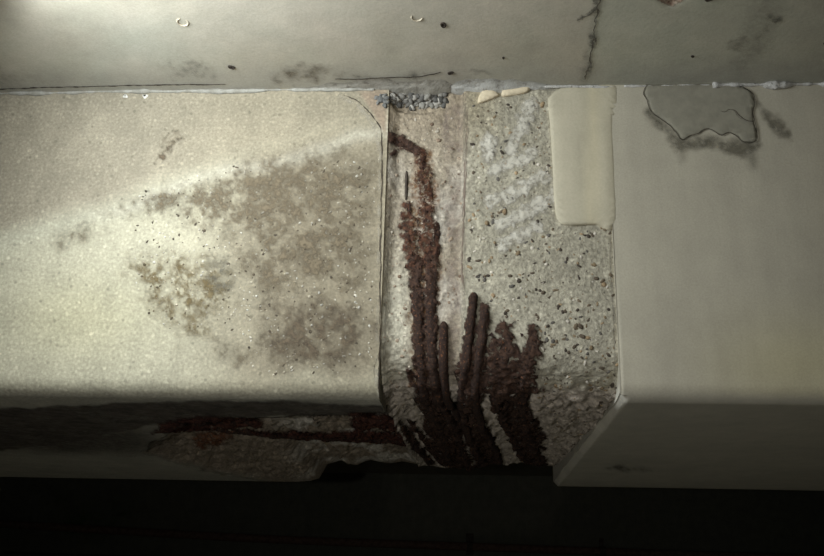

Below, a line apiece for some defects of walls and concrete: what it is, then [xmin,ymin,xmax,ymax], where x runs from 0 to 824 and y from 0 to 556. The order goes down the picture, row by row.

crack [580,0,601,79]
water stain [146,193,180,211]
water stain [137,257,225,333]
water stain [185,157,370,298]
water stain [260,303,358,365]
spalling [145,90,618,482]
corrosion [387,131,441,389]
corrosion [454,302,548,467]
corrosion [152,413,442,465]